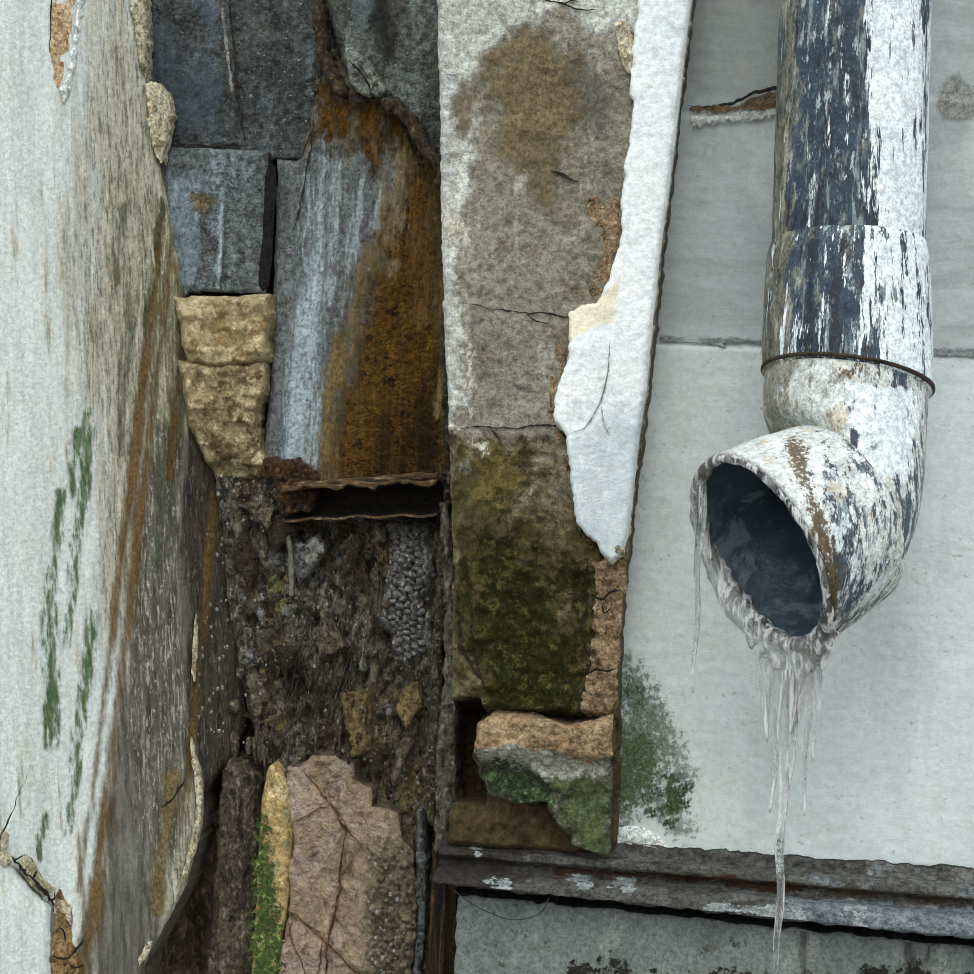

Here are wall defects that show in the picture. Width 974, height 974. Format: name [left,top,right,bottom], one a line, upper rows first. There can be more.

spalling [49,0,85,104]
water stain [450,24,614,207]
crack [687,86,777,130]
rust [310,77,446,487]
water stain [442,210,466,246]
water stain [468,436,490,456]
crack [455,424,567,447]
peeling [473,0,693,857]
rust [77,219,183,974]
rust [150,492,217,916]
crack [0,768,55,906]
peeling [859,957,931,974]